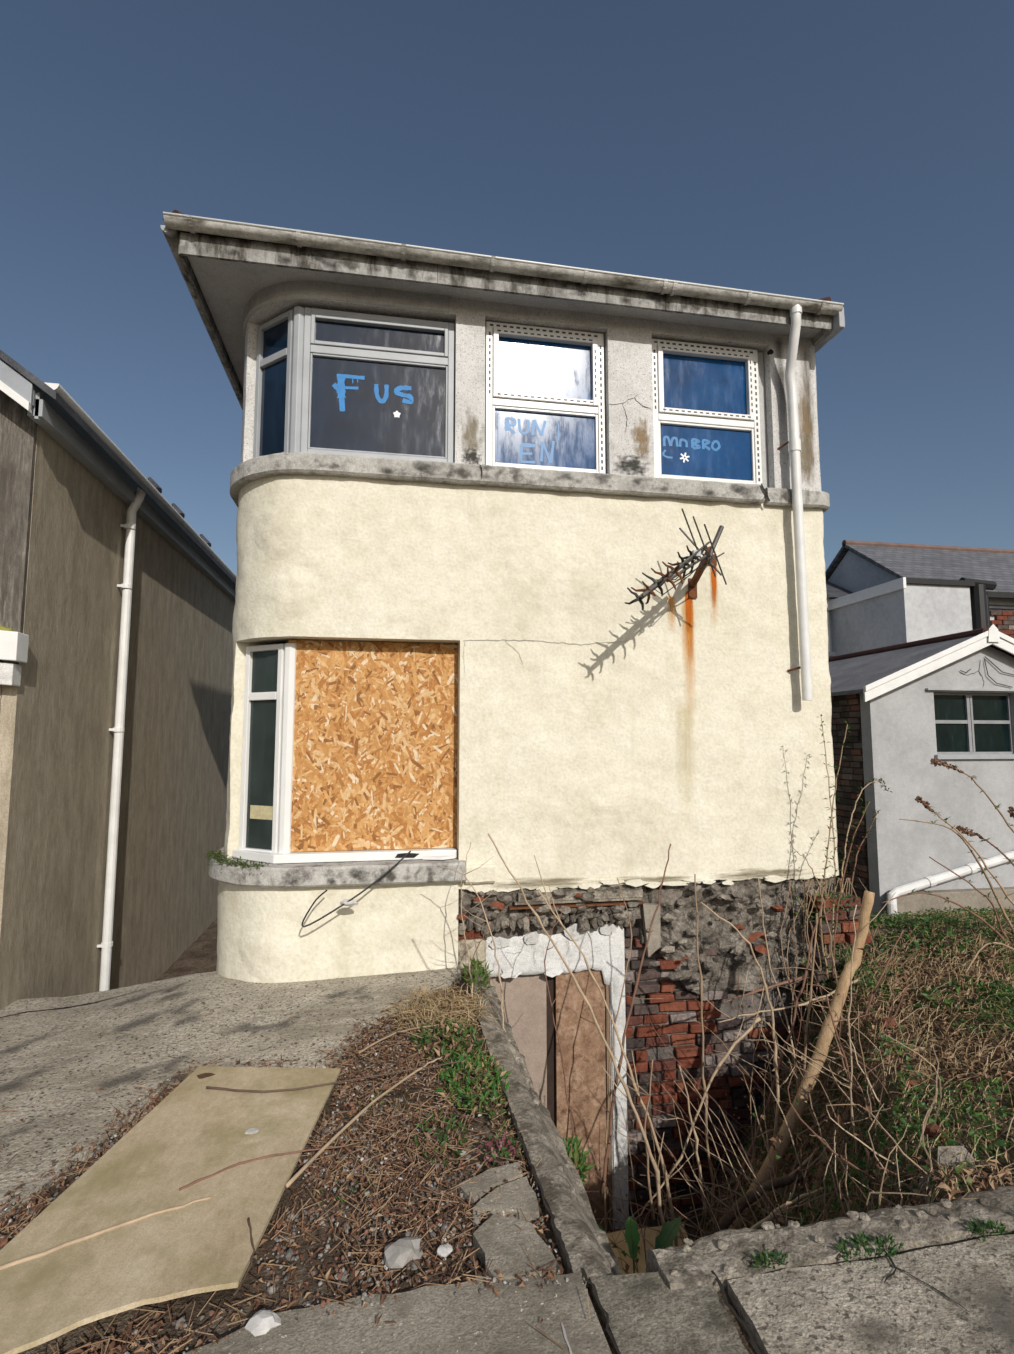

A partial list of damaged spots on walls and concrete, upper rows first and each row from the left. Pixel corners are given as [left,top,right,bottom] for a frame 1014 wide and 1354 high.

leakage [448,419,479,477]
leakage [601,421,649,483]
corrosion [669,592,693,655]
spalling [457,875,845,1121]
spalling [593,1232,615,1268]